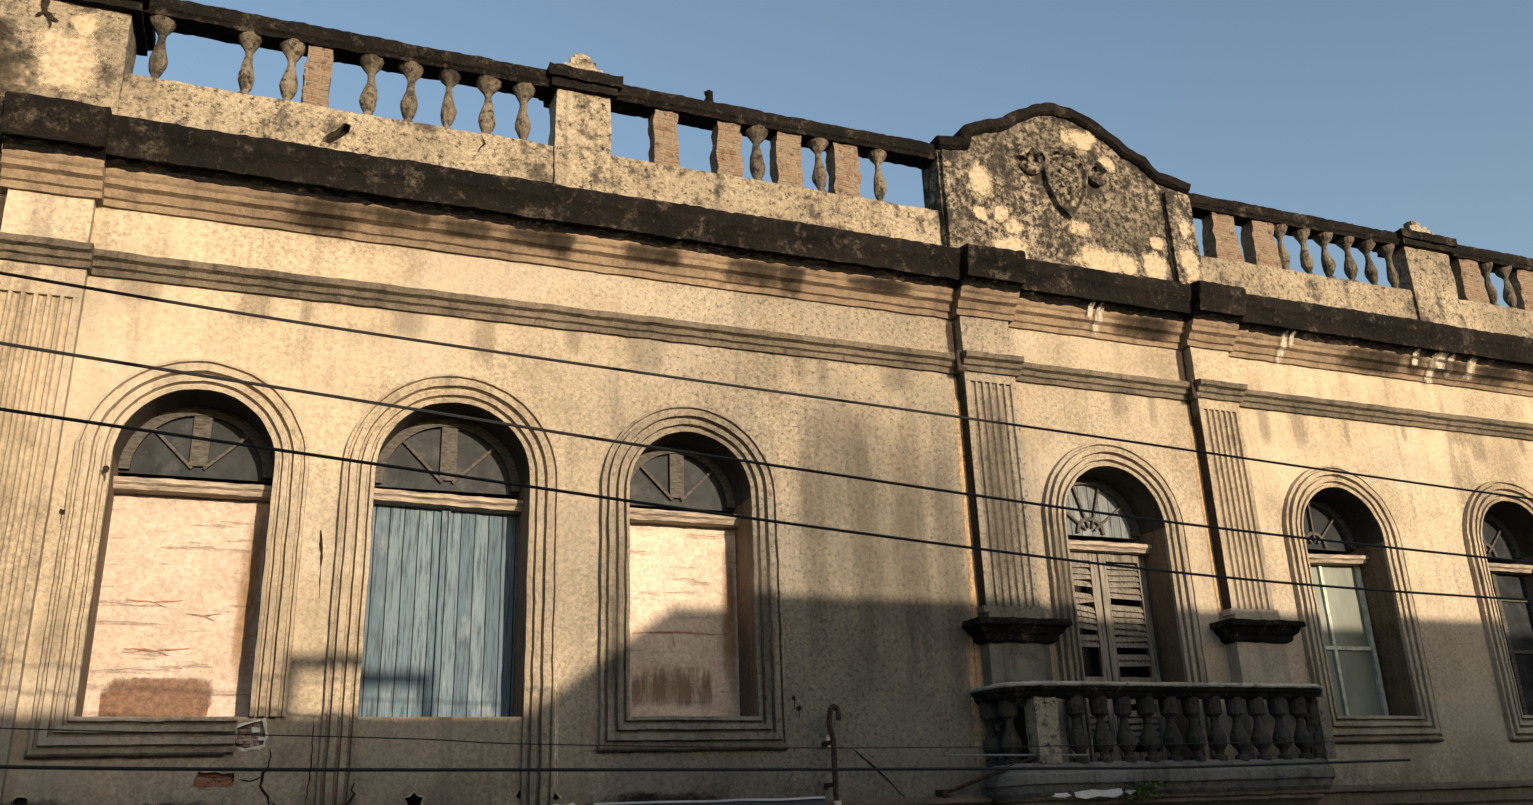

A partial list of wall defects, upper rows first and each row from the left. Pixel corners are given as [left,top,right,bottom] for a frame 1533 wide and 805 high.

flaking render [1060,130,1115,172]
leakage [299,196,350,232]
leakage [377,207,431,225]
flaking render [969,162,1032,259]
flaking render [1067,221,1200,283]
leakage [728,259,805,293]
leakage [1277,332,1296,363]
leakage [1343,347,1533,384]
leakage [946,322,985,606]
spalling [234,717,268,752]
crack [238,717,356,805]
spalling [190,771,238,791]